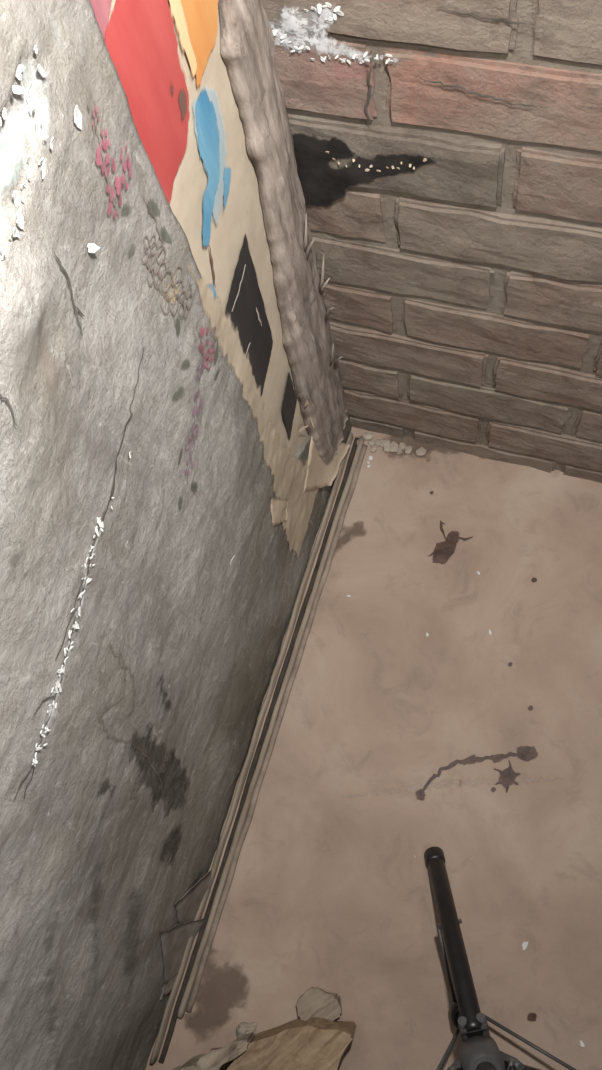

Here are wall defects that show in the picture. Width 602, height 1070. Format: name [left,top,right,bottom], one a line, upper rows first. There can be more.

crack [417,74,547,108]
peeling [0,45,54,264]
crack [0,394,17,426]
damp [429,521,473,564]
crack [14,348,144,800]
damp [99,643,188,815]
damp [416,746,538,800]
damp [160,826,182,865]